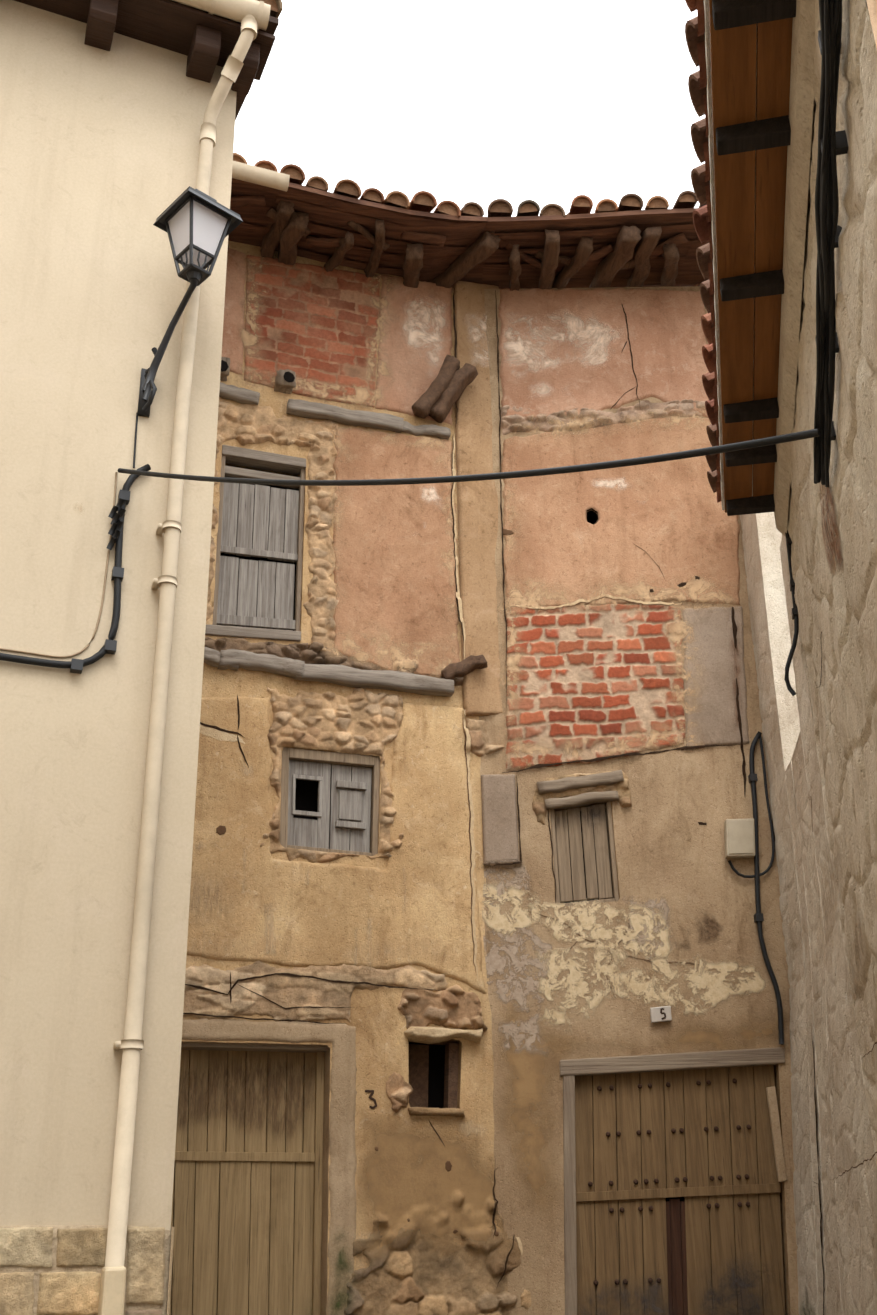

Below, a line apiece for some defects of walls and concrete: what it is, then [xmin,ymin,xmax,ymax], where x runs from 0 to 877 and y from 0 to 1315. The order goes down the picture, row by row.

crack [495,290,682,701]
crack [200,695,249,767]
flaking render [465,589,686,825]
crack [183,972,444,1024]
flaking render [386,1072,413,1113]
peeling [183,860,765,1051]
crack [811,1028,877,1315]